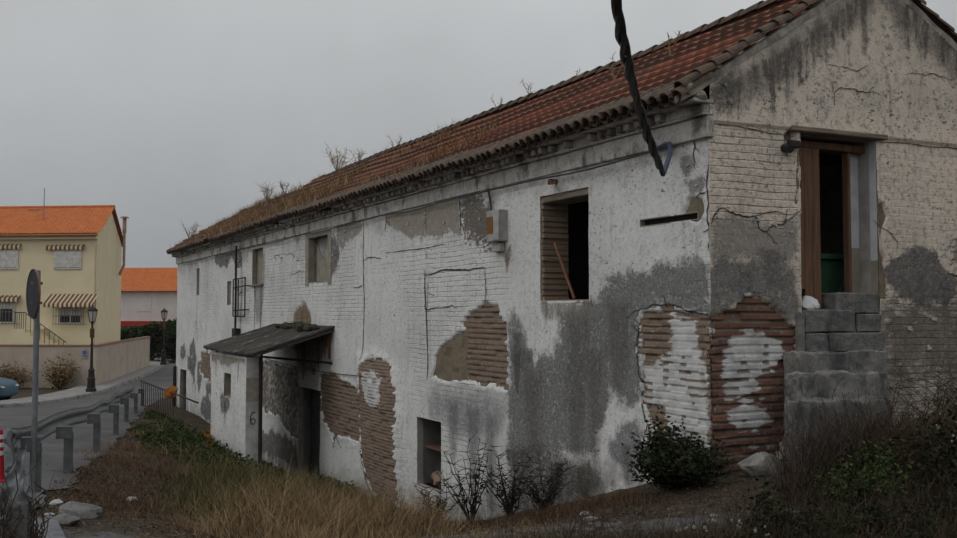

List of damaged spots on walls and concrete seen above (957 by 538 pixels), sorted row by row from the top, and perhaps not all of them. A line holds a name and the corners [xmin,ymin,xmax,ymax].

water stain [752,0,868,110]
crack [829,64,880,106]
flaking render [386,192,497,256]
flaking render [680,155,706,222]
crack [693,141,801,249]
water stain [883,245,957,307]
flaking render [262,361,299,470]
flaking render [320,371,361,444]
flaking render [433,302,509,390]
water stain [434,249,802,512]
flaking render [637,292,795,474]